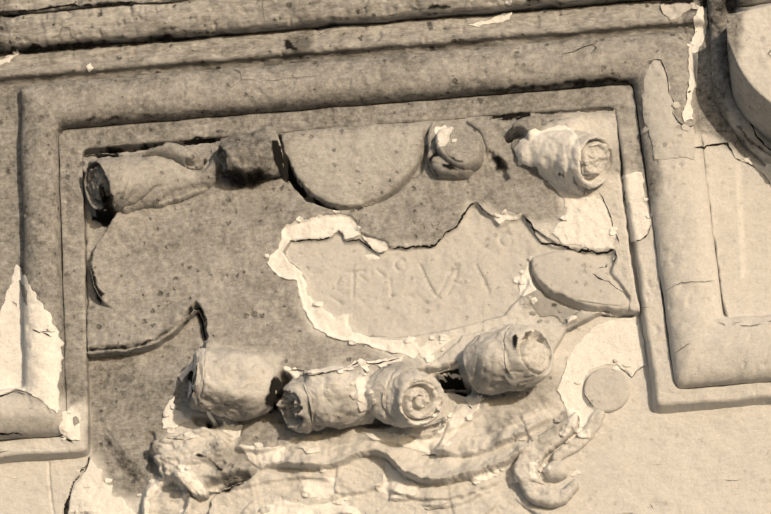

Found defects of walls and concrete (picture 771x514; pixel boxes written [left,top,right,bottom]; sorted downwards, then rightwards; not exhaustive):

flaking render [641,2,708,160]
flaking render [0,265,81,441]
crack [64,456,90,514]
flaking render [360,395,484,456]
crack [393,202,492,249]
spalling [264,125,652,444]